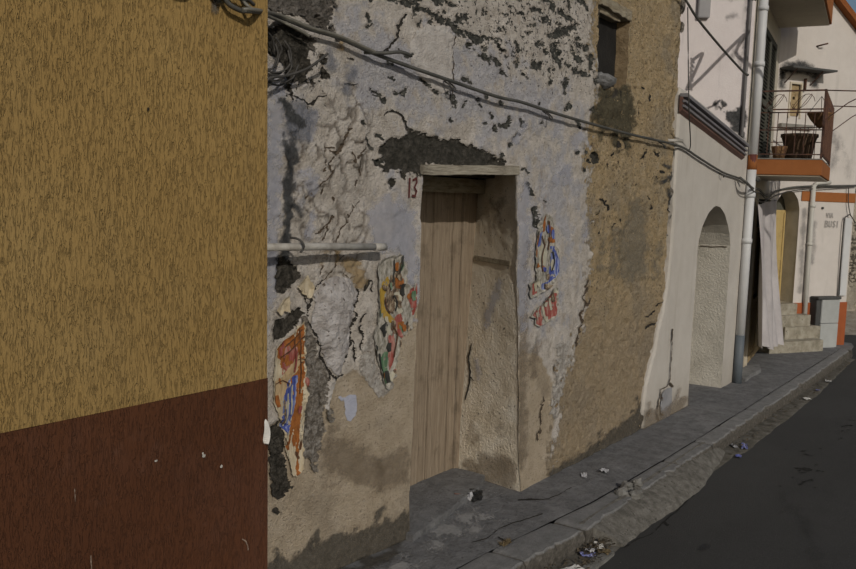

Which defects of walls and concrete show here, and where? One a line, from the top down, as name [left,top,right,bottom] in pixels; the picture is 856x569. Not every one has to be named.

flaking render [389,0,599,111]
spalling [372,112,527,189]
leakage [591,108,631,156]
flaking render [275,255,301,293]
crack [303,128,373,382]
flaking render [273,307,344,473]
crack [465,343,474,400]
flaking render [268,421,294,515]
leakage [268,507,410,569]